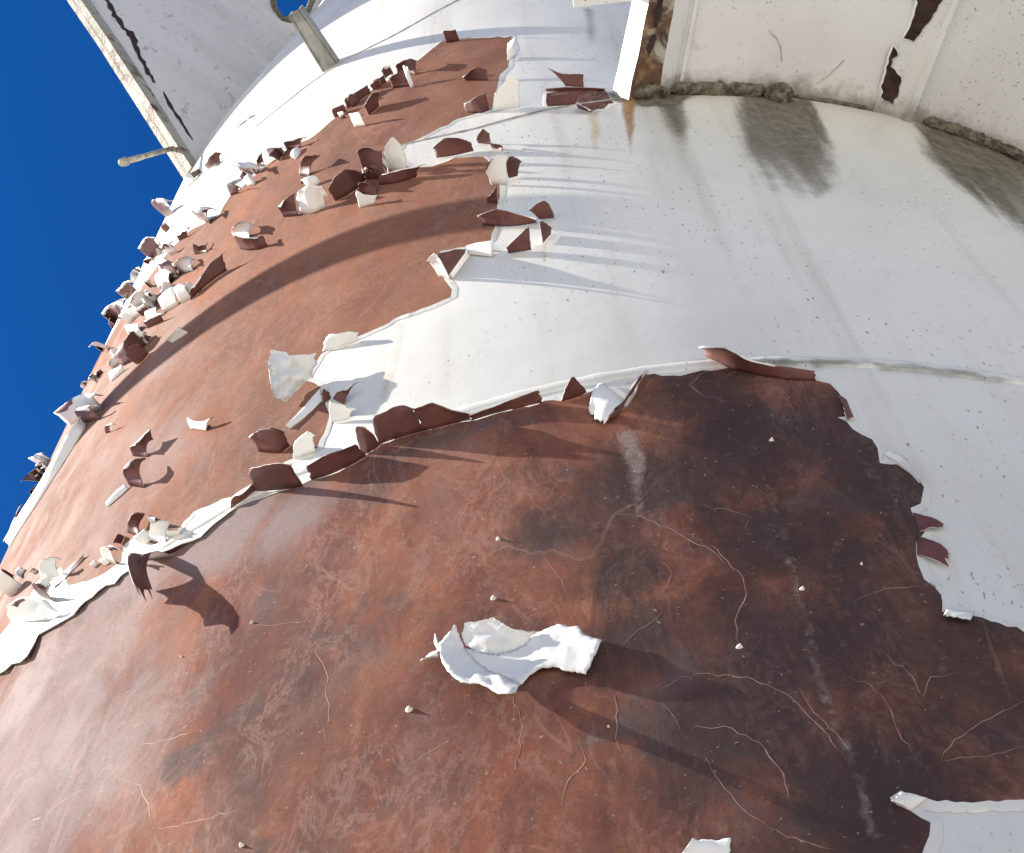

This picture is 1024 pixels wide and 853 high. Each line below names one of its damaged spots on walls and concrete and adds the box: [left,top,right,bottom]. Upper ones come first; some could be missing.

peeling [106,0,193,140]
peeling [879,0,944,106]
water stain [739,96,829,186]
water stain [918,126,1024,224]
peeling [0,29,554,639]
peeling [0,346,1024,853]
crack [611,513,747,642]
crack [313,648,330,747]
crack [659,673,853,851]
crack [850,677,915,758]
crack [878,649,956,697]
crack [942,702,1021,761]